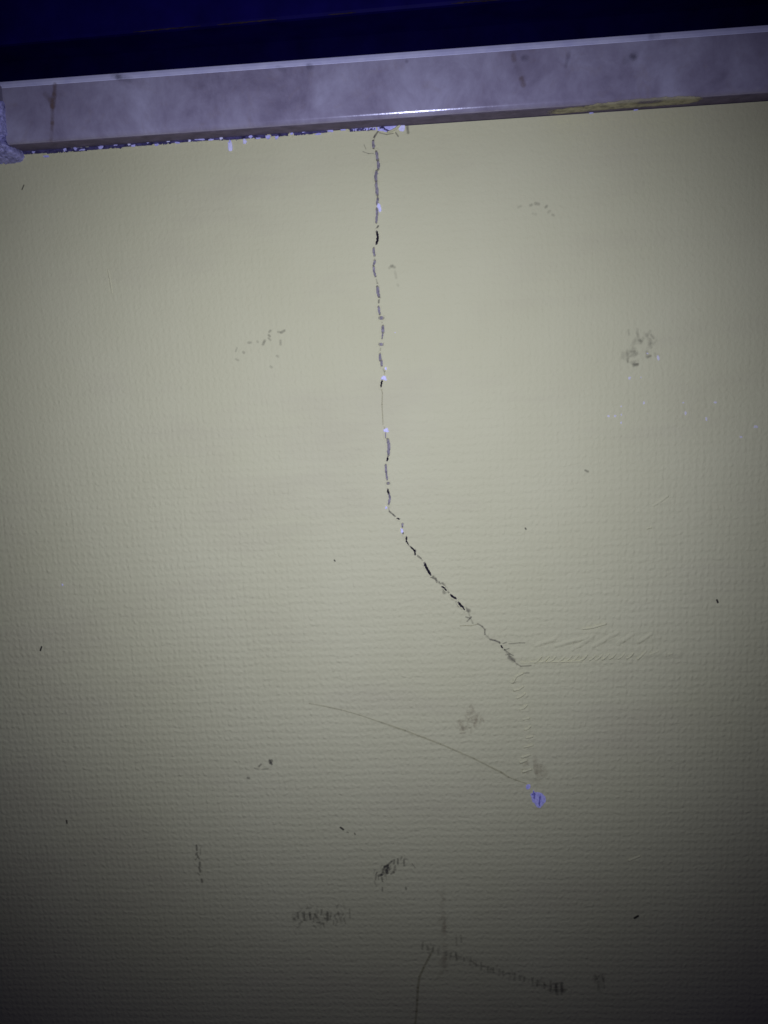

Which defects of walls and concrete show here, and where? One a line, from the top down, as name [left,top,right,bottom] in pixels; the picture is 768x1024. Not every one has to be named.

crack [382,428,510,654]